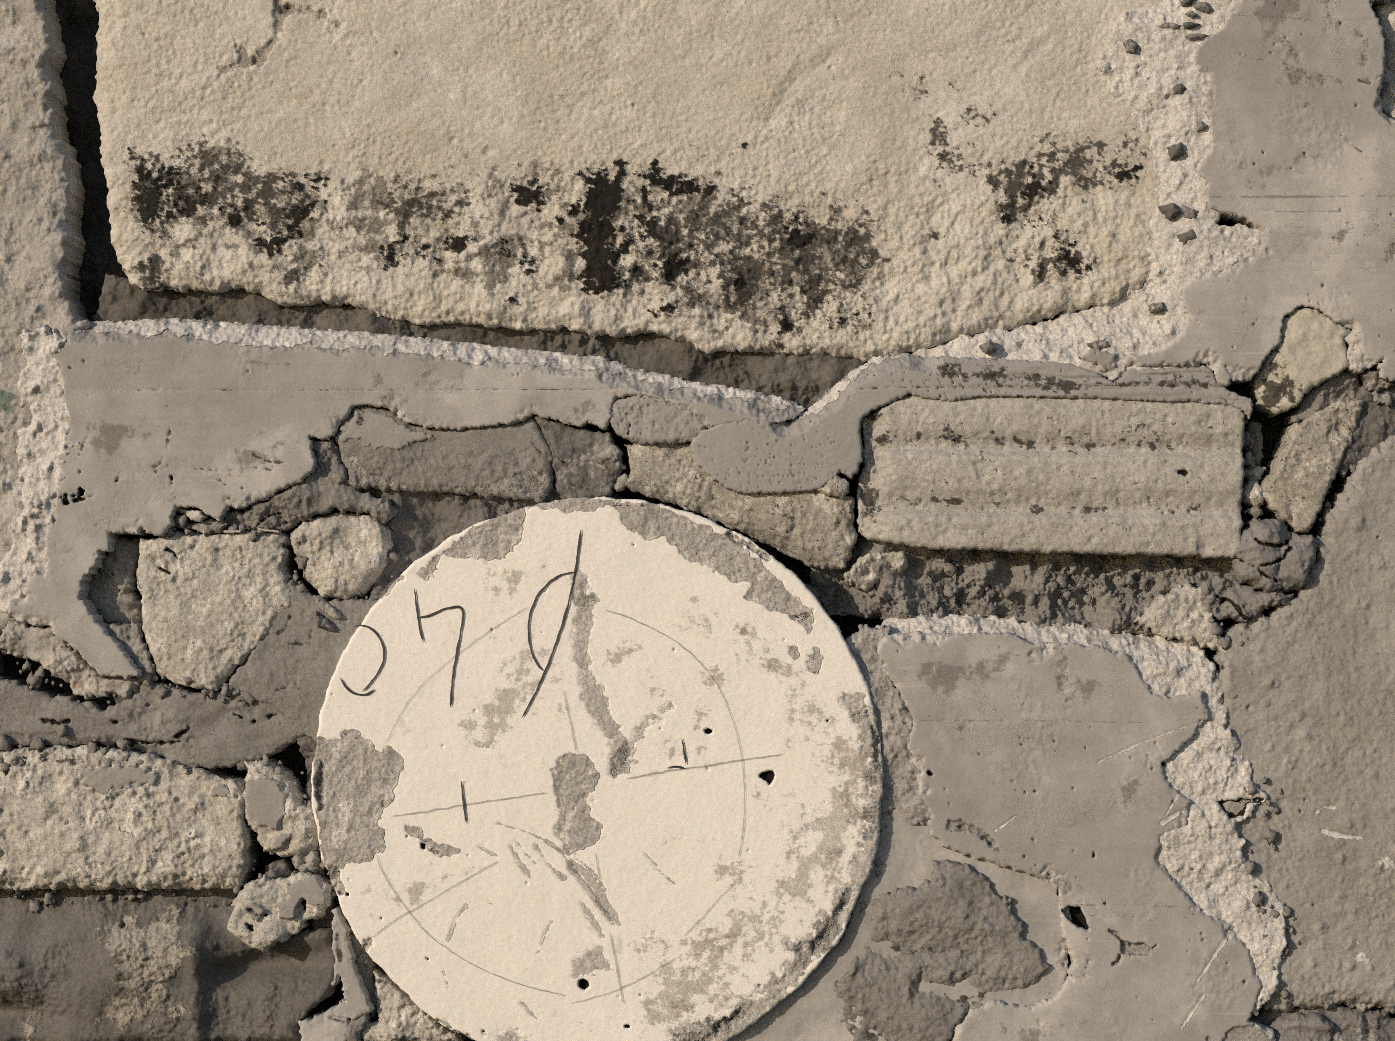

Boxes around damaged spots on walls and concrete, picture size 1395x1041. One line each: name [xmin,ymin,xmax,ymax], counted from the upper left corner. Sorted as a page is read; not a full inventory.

spalling [1278,37,1341,107]
leakage [117,134,890,354]
spalling [0,0,1261,618]
leakage [898,72,1148,296]
spalling [312,595,343,632]
peeling [380,468,823,674]
spalling [668,613,1287,1041]
peeling [437,1019,527,1041]